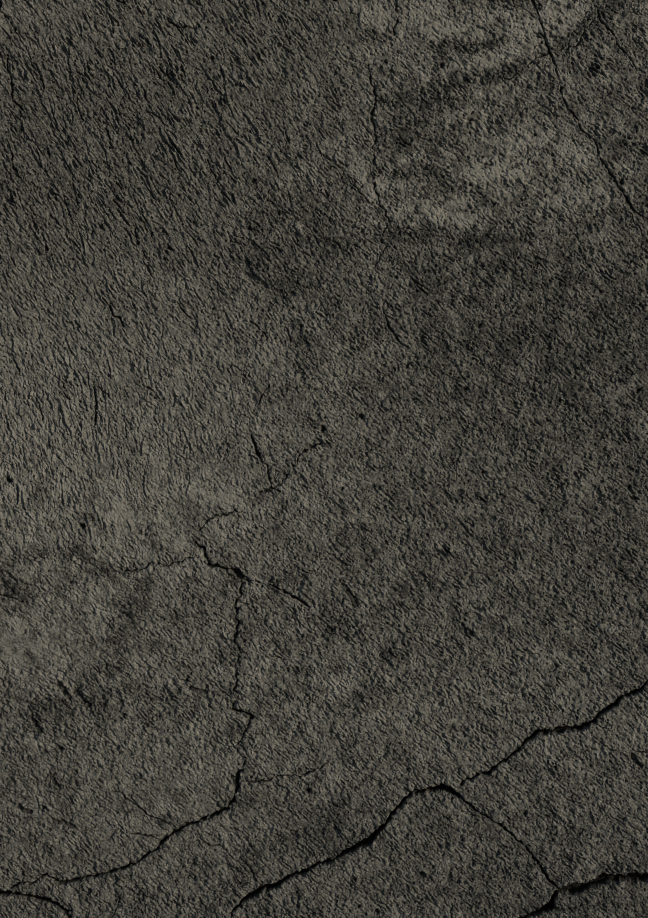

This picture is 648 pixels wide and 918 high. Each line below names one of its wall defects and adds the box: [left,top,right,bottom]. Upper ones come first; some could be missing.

crack [503,0,648,244]
crack [0,430,648,918]